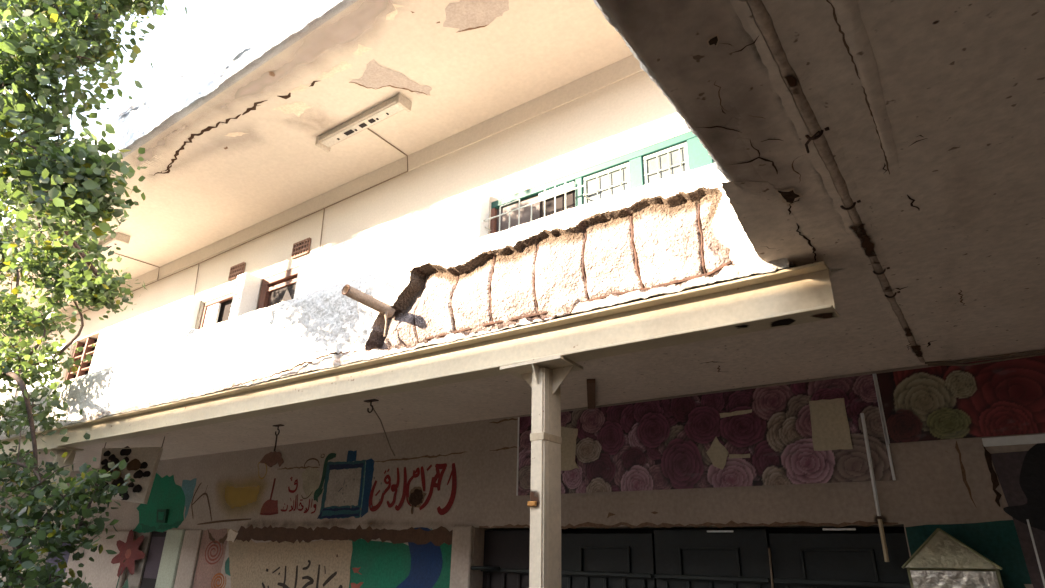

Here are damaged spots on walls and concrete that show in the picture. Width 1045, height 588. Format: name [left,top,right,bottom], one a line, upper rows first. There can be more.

peeling [437,0,509,32]
peeling [272,44,432,117]
corrosion [784,75,798,94]
crack [154,81,318,176]
crack [699,81,816,281]
spalling [364,181,815,351]
corrosion [849,224,879,264]
corrosion [771,318,795,327]
corrosion [904,328,922,357]
crack [955,441,1002,508]